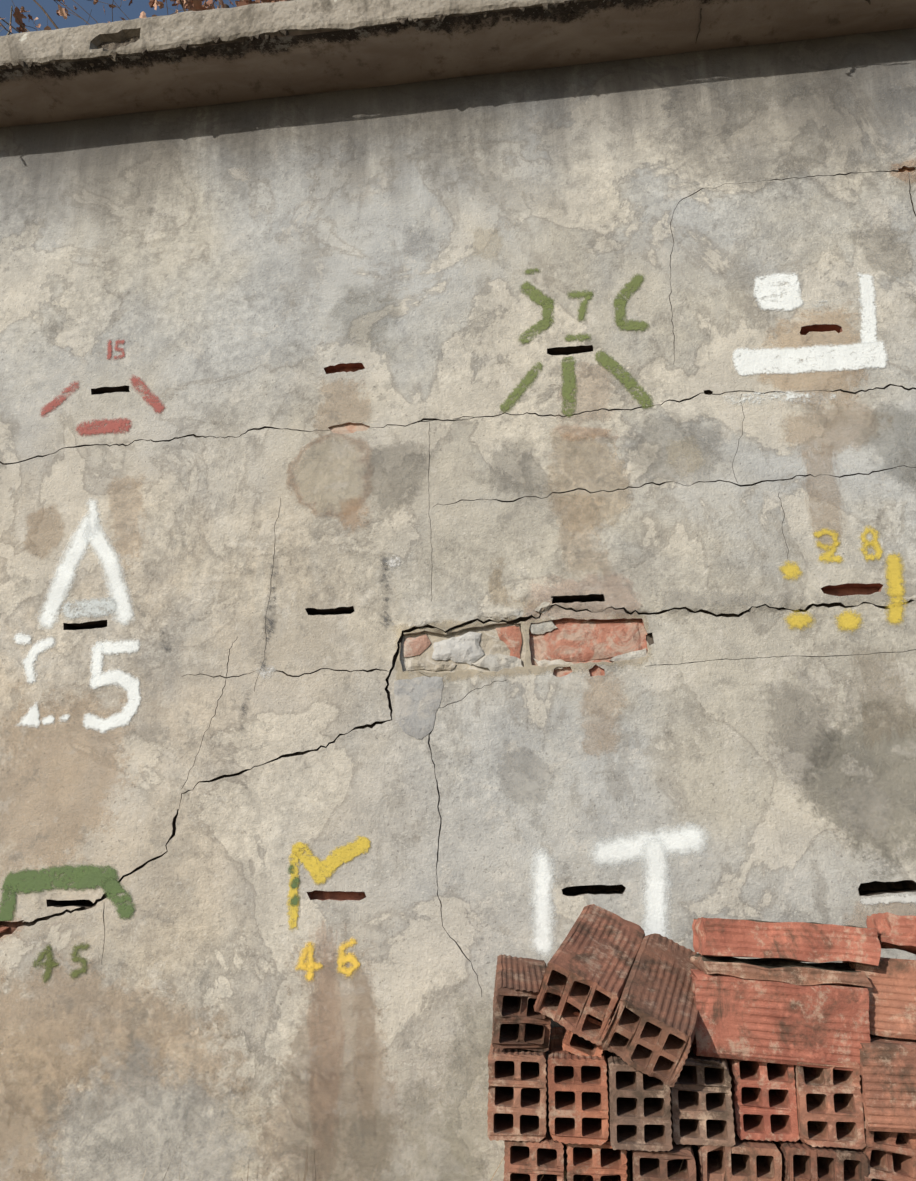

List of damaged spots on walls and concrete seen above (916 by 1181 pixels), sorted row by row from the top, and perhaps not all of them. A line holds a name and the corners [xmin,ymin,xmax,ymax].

crack [669,167,916,361]
crack [0,426,331,465]
crack [373,384,916,553]
crack [22,498,916,994]
spalling [394,618,654,740]
spalling [0,920,25,938]